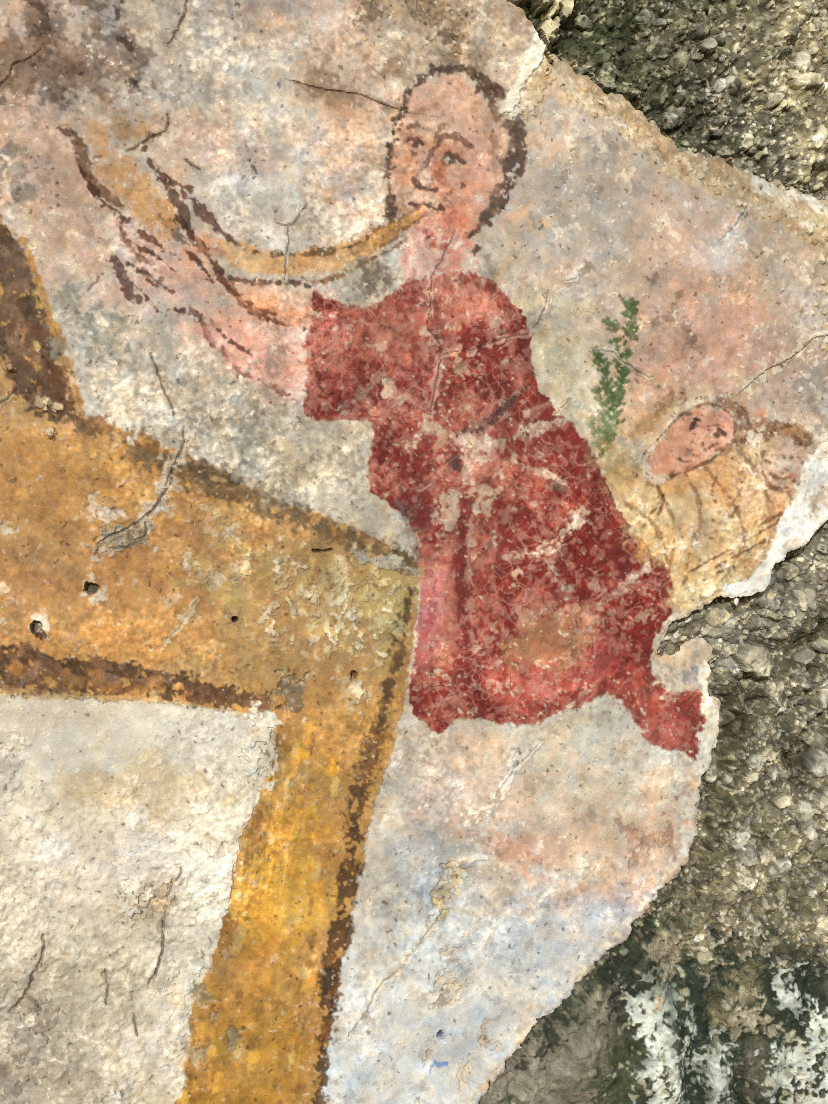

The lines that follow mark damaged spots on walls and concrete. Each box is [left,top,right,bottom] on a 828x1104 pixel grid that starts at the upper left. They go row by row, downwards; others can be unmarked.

crack [168,0,189,45]
crack [323,90,441,118]
crack [745,335,828,389]
peeling [381,378,412,407]
crack [95,350,186,555]
peeling [418,410,568,572]
peeling [503,506,591,588]
peeling [617,562,652,595]
peeling [500,597,596,677]
spalling [657,636,696,656]
flaking render [615,812,678,871]
flaking render [429,945,463,1011]